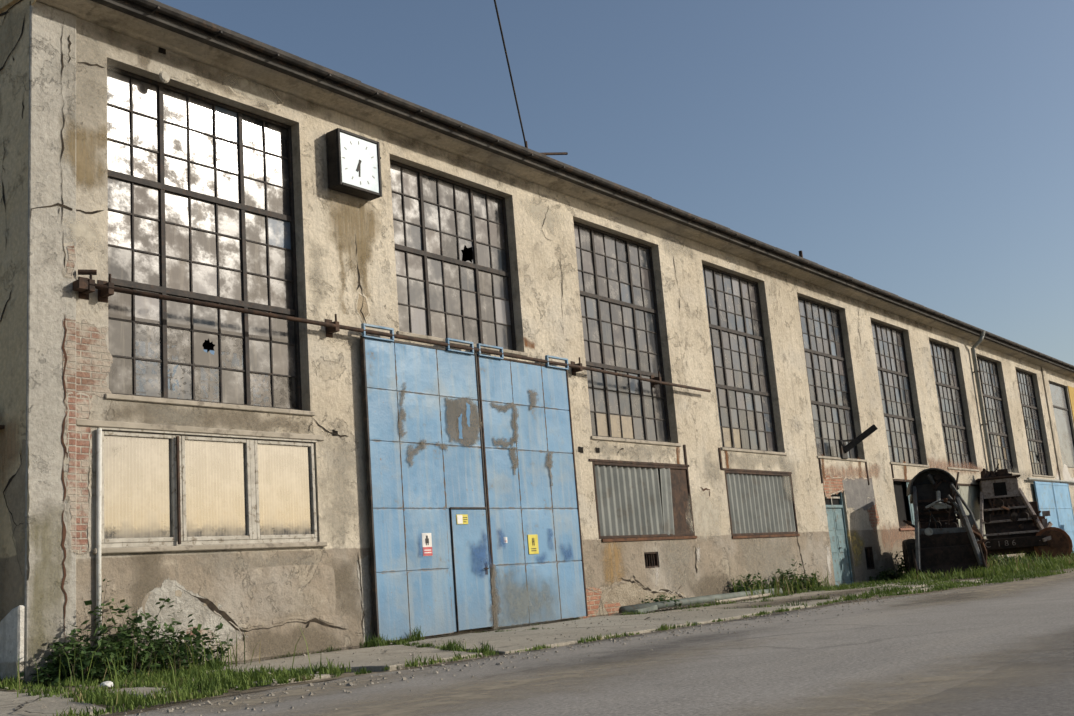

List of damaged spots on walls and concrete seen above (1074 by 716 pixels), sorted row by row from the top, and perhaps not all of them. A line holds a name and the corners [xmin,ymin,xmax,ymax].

crack [0,0,25,71]
crack [1,19,105,267]
crack [3,455,22,563]
crack [60,317,68,646]
flaking render [63,319,113,554]
rust [398,383,482,466]
rust [491,390,537,475]
flaking render [823,474,879,533]
crack [175,555,433,653]
crack [622,545,759,619]